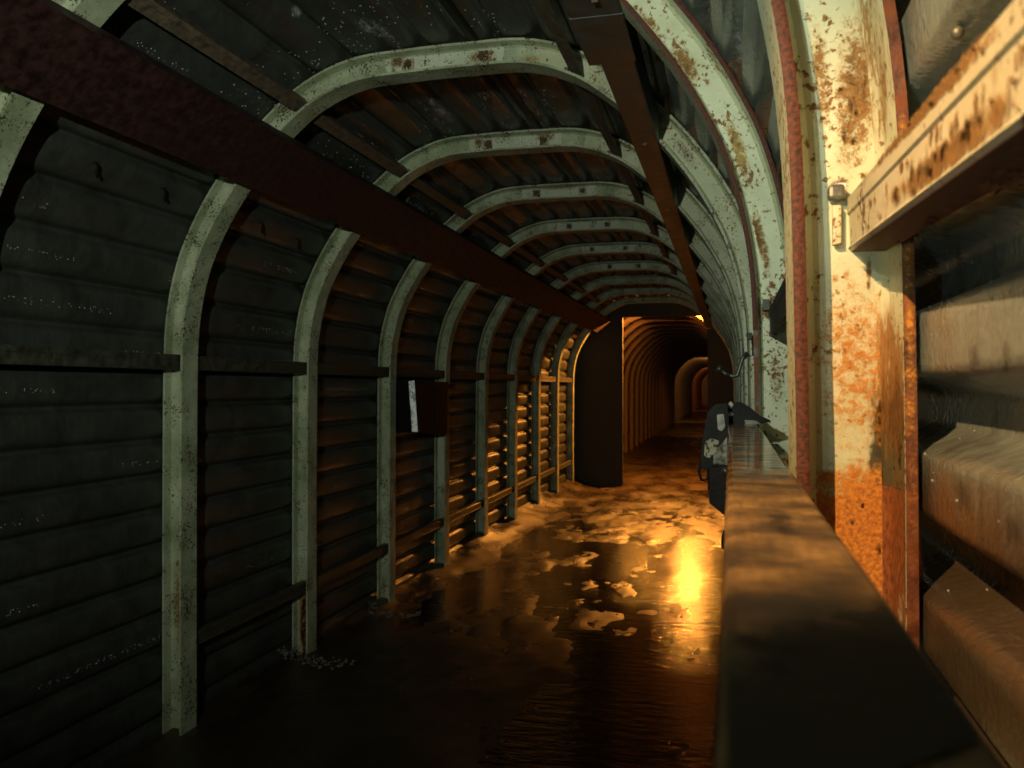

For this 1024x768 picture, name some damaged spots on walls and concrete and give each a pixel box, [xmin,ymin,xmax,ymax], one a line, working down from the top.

rust [619,0,774,330]
rust [673,0,1024,627]